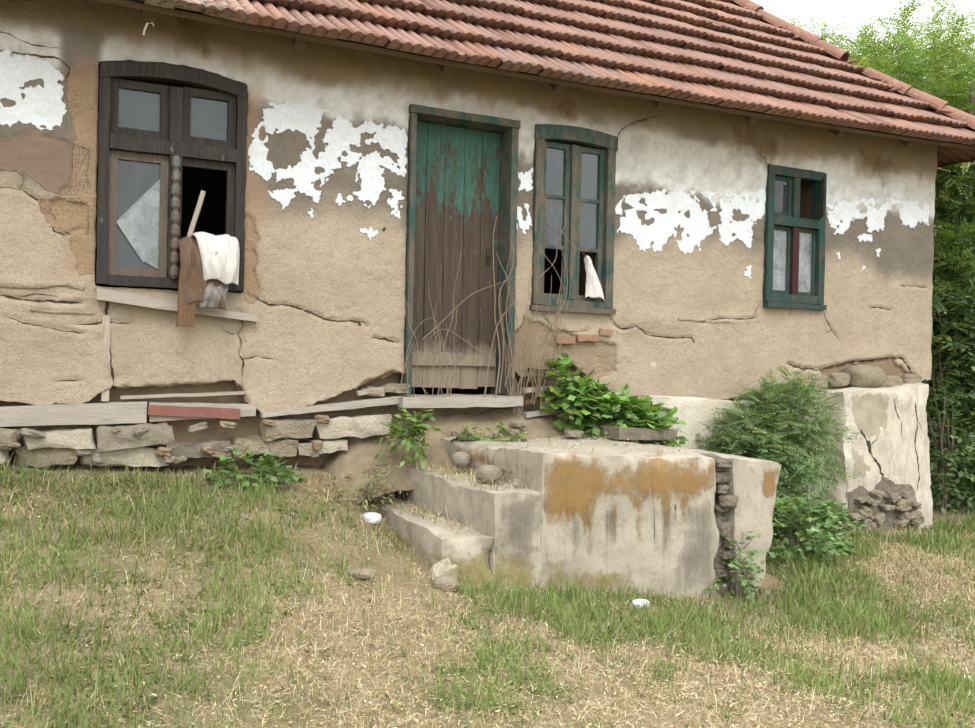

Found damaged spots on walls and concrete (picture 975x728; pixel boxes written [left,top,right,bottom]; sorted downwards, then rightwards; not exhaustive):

crack [0,31,76,107]
flaking render [0,46,97,275]
peeling [248,102,408,219]
crack [0,170,75,237]
peeling [359,227,386,240]
peeling [615,188,766,254]
peeling [826,197,931,257]
crack [607,304,760,345]
crack [790,357,913,374]
crack [855,398,922,491]